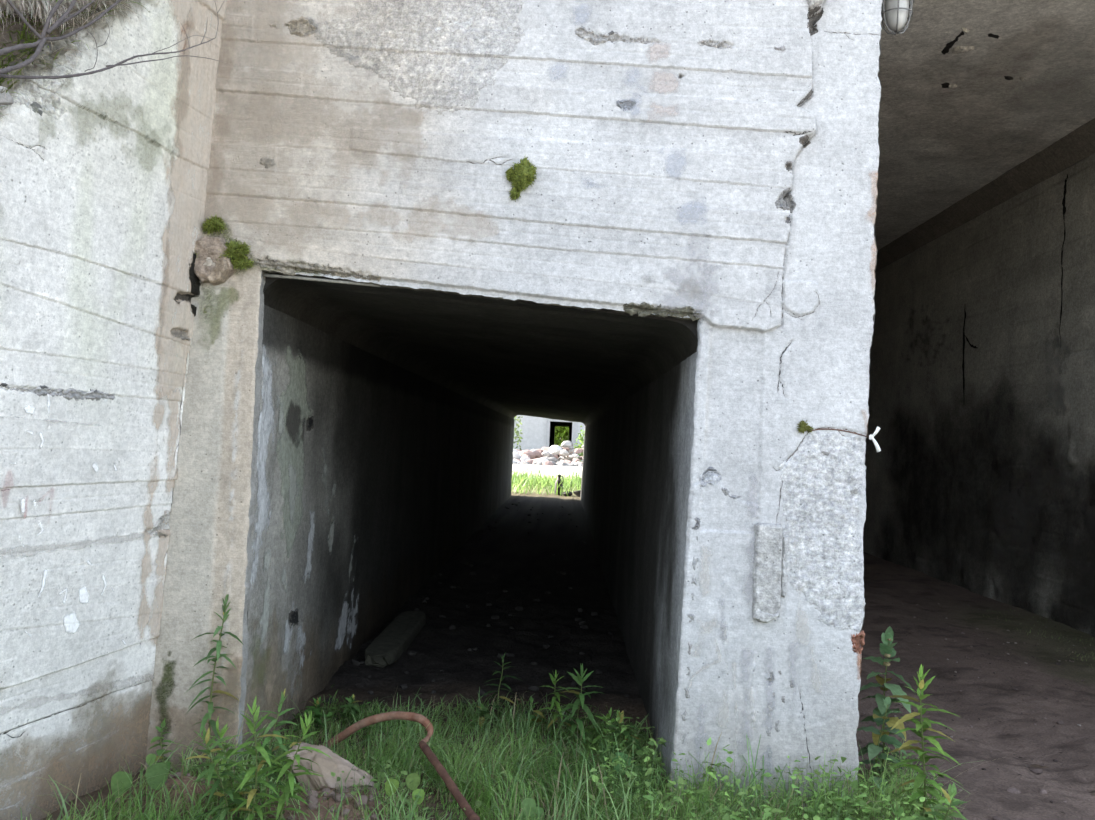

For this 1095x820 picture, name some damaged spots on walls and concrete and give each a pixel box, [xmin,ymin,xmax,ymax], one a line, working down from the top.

spalling [268,0,525,115]
spalling [575,26,659,45]
spalling [698,38,732,49]
spalling [260,157,276,169]
spalling [775,187,797,224]
crack [1059,174,1068,348]
spalling [173,251,201,317]
leakage [0,0,227,643]
spalling [170,327,190,341]
crack [752,249,819,396]
spalling [0,383,115,401]